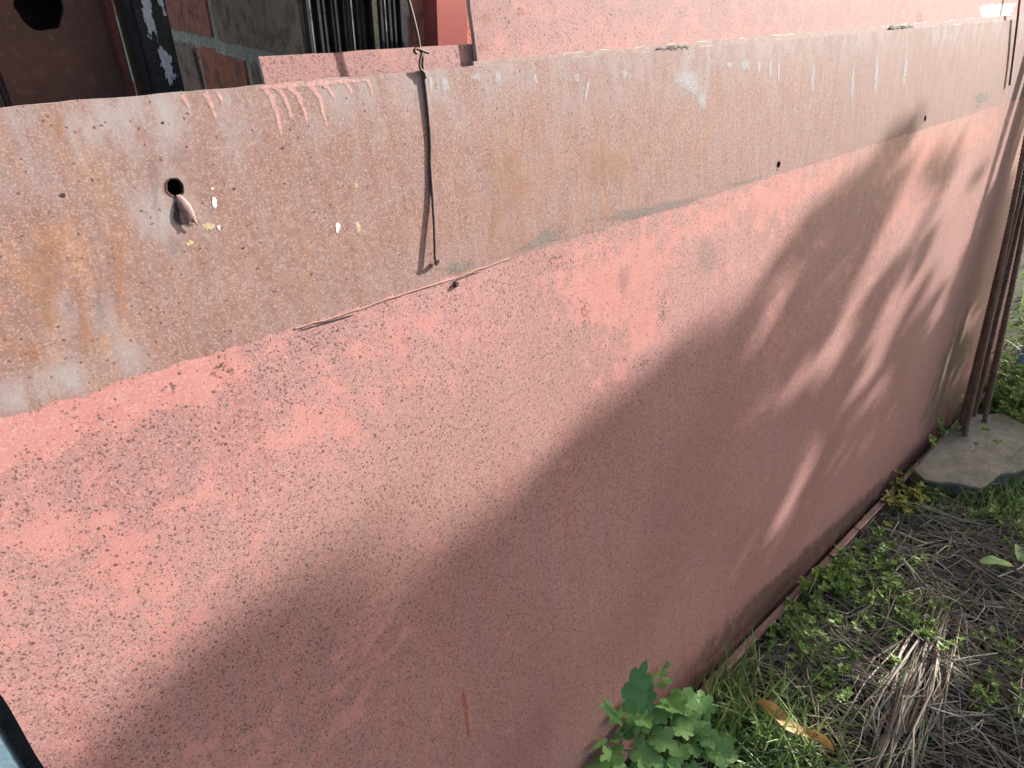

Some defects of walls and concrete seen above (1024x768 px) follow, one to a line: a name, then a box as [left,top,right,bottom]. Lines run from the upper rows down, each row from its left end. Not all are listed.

leakage [261,79,373,134]